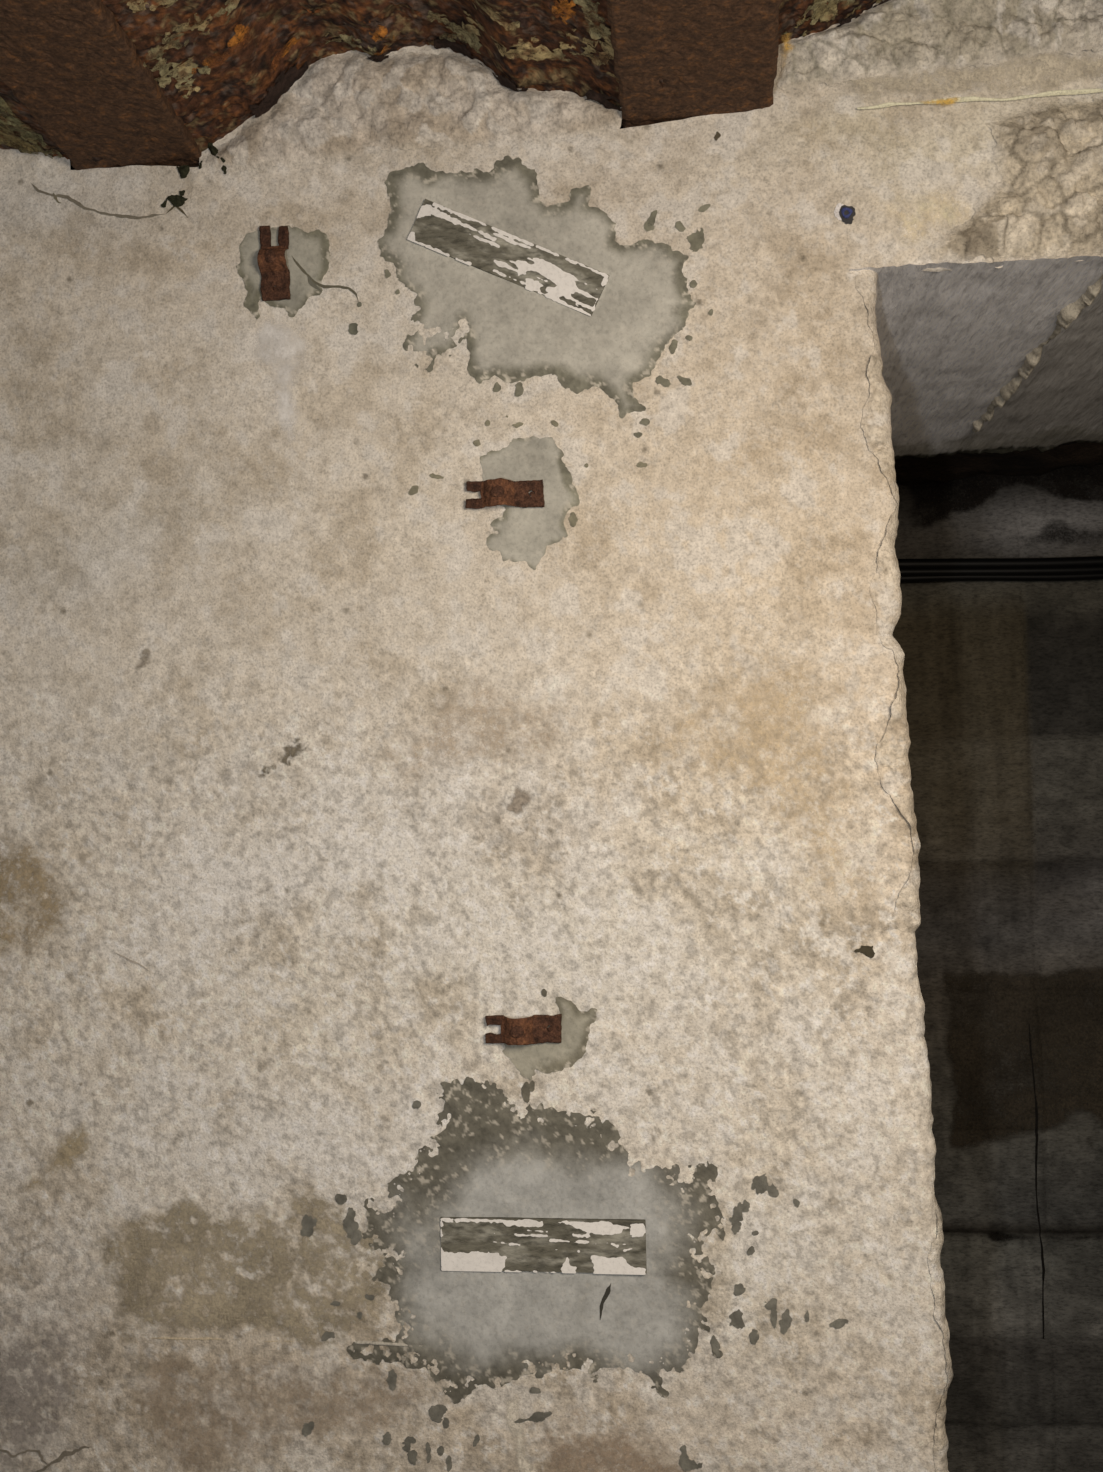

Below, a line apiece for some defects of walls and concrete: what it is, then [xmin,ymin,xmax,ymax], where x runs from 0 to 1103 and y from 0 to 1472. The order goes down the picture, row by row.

crack [31,183,187,219]
flaking render [236,225,331,319]
flaking render [348,302,362,335]
flaking render [377,155,713,438]
flaking render [473,415,588,570]
damp [910,465,1103,526]
damp [944,968,1103,1147]
flaking render [322,989,809,1428]
damp [105,1198,386,1346]
crack [0,1446,89,1472]
flaking render [382,1432,452,1471]
flaking render [679,1445,703,1472]